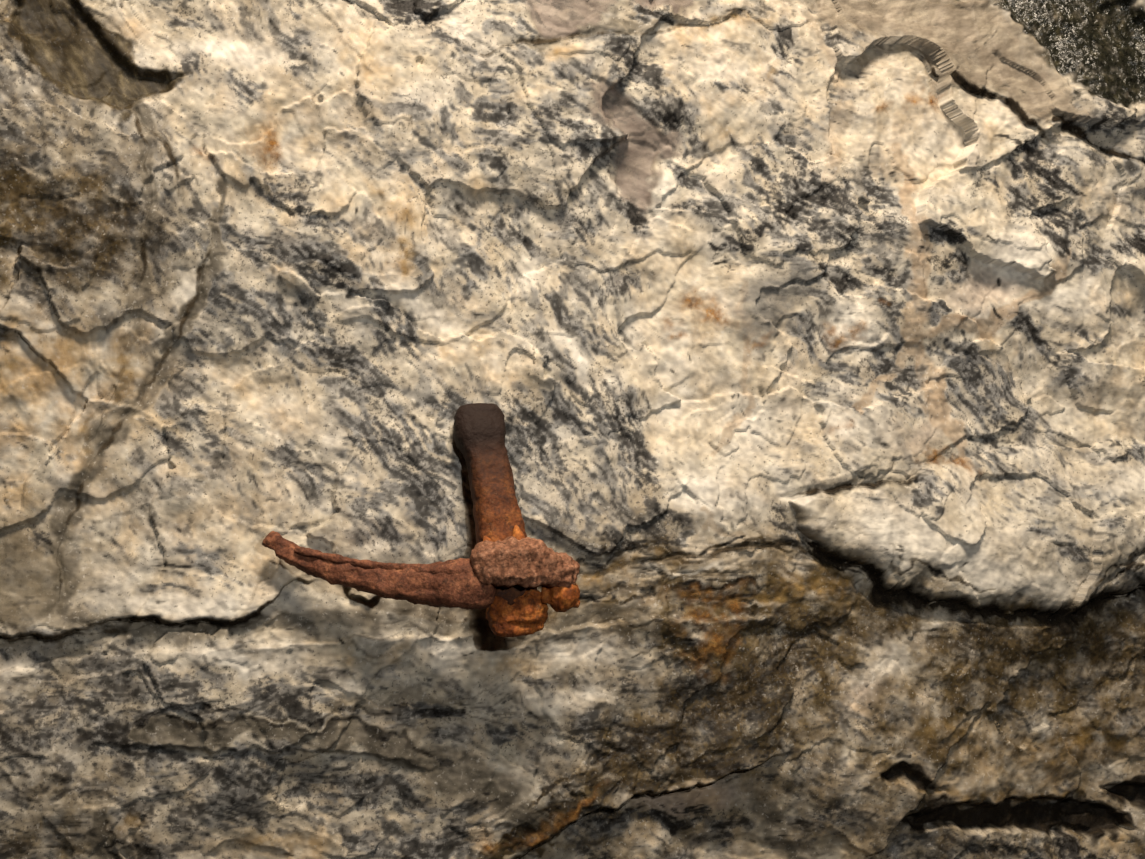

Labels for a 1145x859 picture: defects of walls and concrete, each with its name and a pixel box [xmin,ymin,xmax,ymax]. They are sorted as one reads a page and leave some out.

spalling [529,0,613,38]
spalling [816,0,1089,122]
crack [136,114,179,176]
spalling [591,83,678,211]
crack [140,236,148,273]
crack [149,254,209,384]
crack [100,421,122,451]
crack [68,483,84,520]
crack [797,475,919,495]
crack [598,541,1145,631]
crack [0,596,278,643]
crack [514,786,703,859]